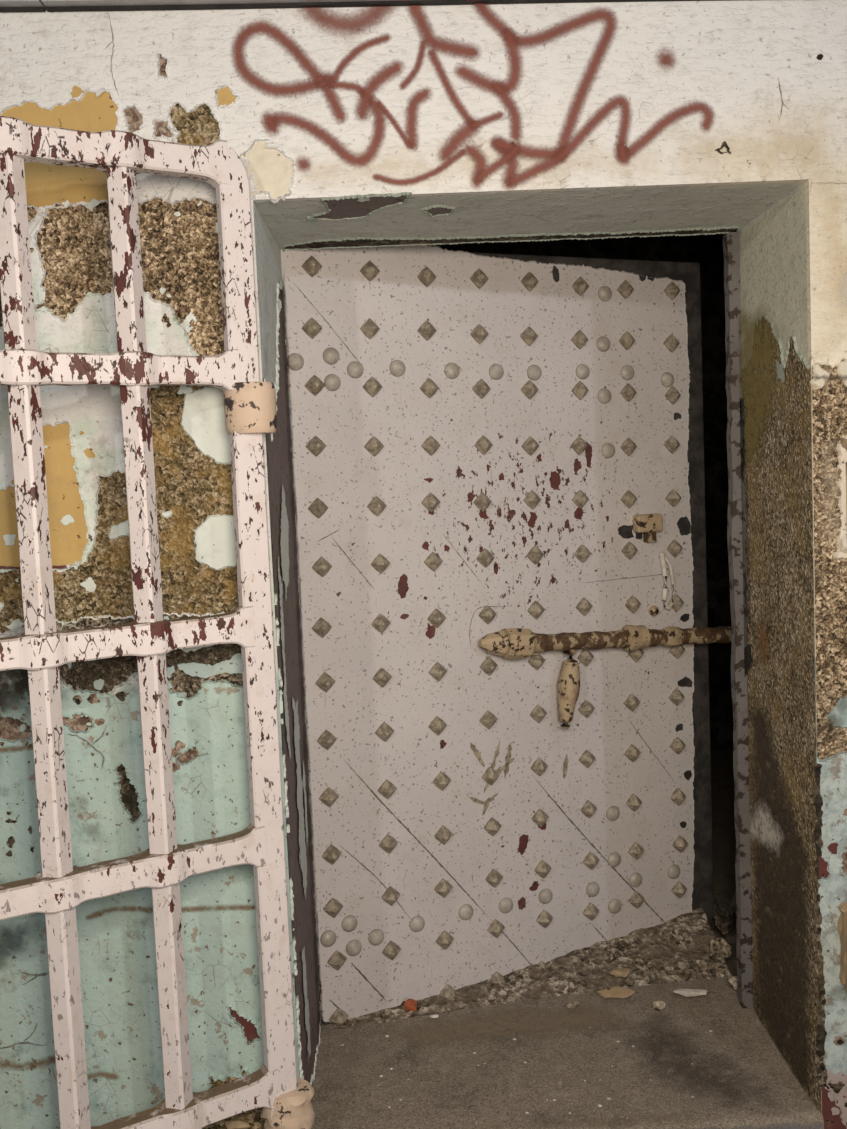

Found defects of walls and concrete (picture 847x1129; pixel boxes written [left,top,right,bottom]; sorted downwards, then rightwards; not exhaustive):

peeling [0,84,240,145]
peeling [24,162,114,323]
peeling [138,196,224,356]
peeling [0,479,25,635]
peeling [42,420,134,631]
peeling [149,385,239,620]
peeling [59,655,138,742]
peeling [166,643,243,706]
peeling [739,314,847,1129]